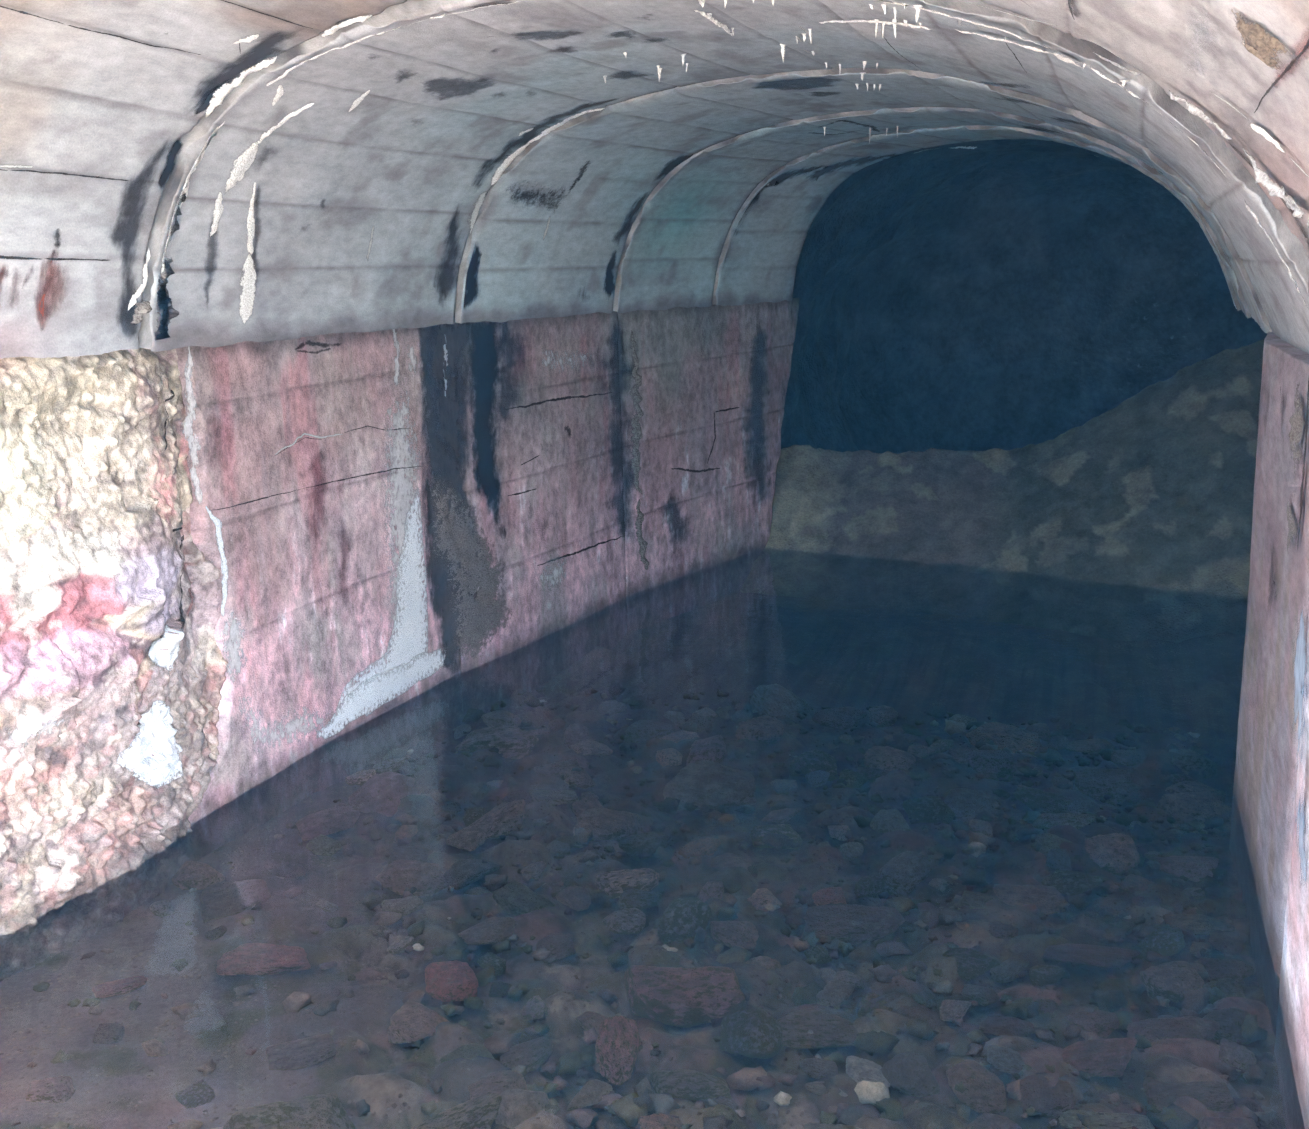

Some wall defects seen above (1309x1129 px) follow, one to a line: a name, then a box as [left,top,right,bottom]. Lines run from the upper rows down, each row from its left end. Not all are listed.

crack [694,0,734,36]
crack [819,0,939,70]
spalling [1232,10,1292,70]
crack [1254,36,1309,113]
leakage [111,0,523,336]
rust [36,229,63,328]
crack [0,254,109,262]
spalling [131,258,179,340]
spalling [170,190,186,236]
leakage [604,194,646,296]
leakage [239,99,616,753]
leakage [609,318,634,538]